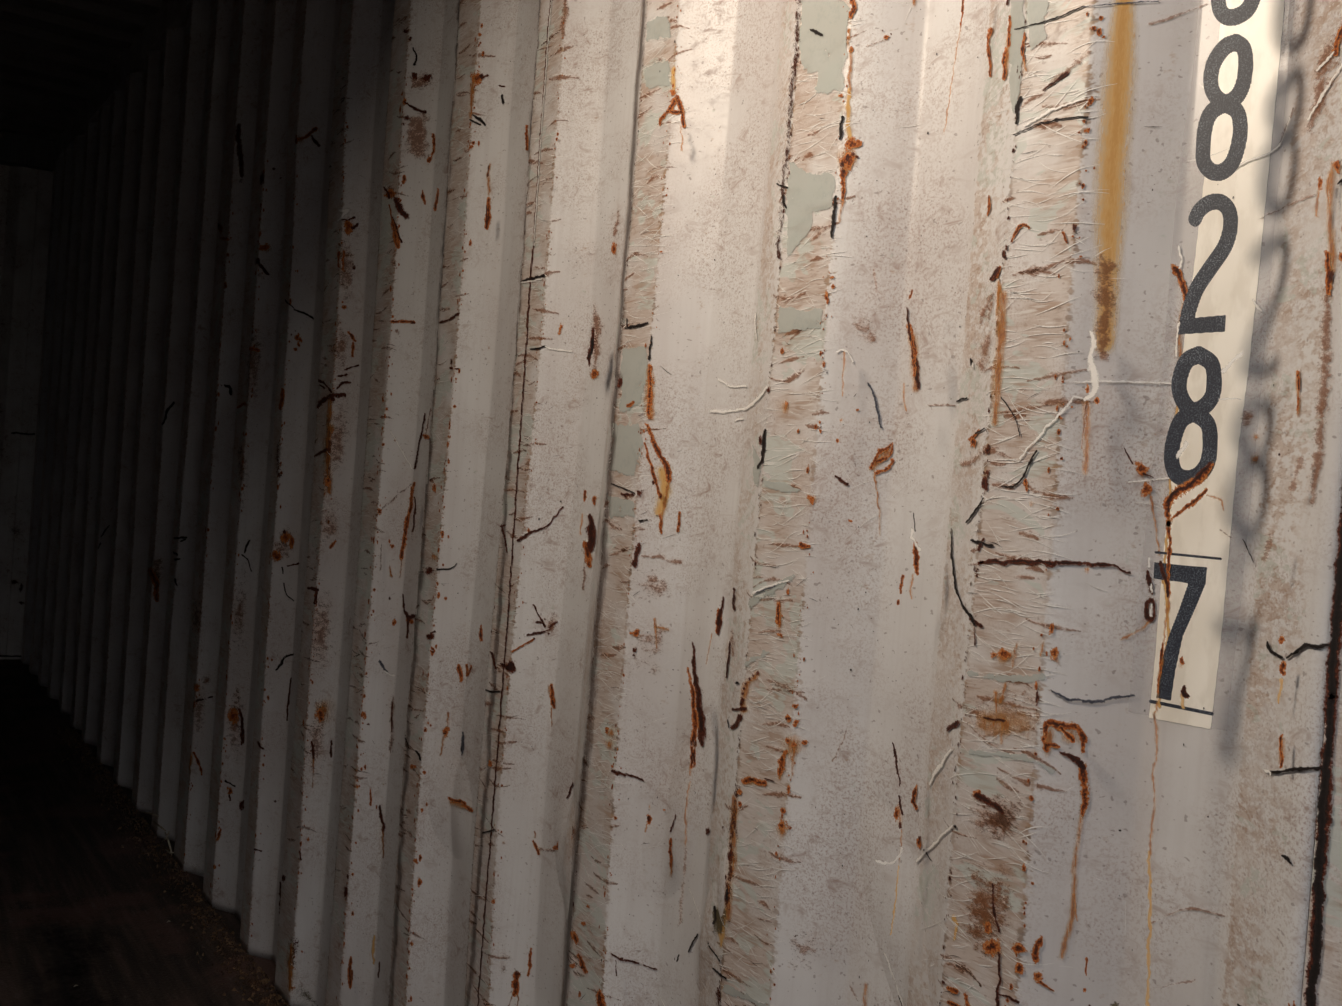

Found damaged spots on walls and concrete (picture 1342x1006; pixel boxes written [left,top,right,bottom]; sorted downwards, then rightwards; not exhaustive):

peeling [798,0,850,95]
rust [1307,24,1342,134]
peeling [783,162,835,256]
rust [1078,0,1133,360]
peeling [777,306,823,333]
peeling [610,346,648,476]
rust [580,313,682,597]
rust [706,653,808,932]
rust [961,623,1090,958]
rust [1288,497,1342,1006]
rust [939,863,1054,1006]